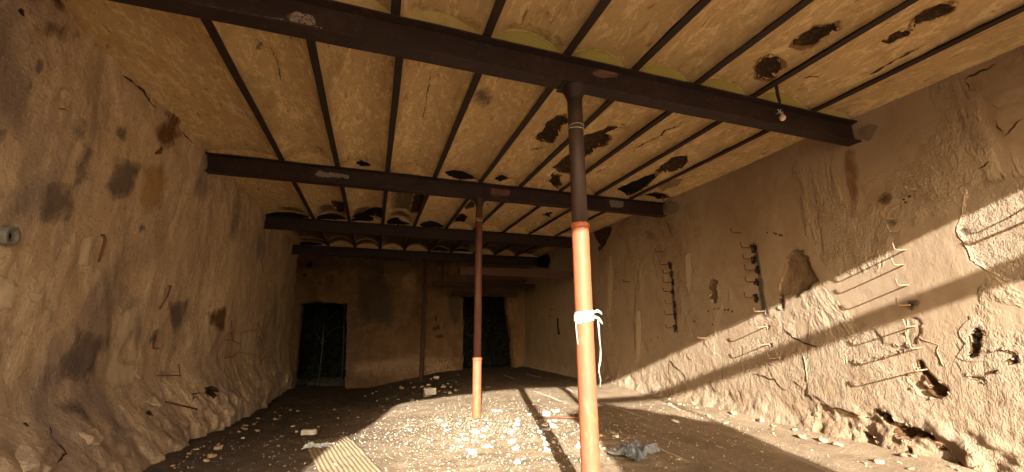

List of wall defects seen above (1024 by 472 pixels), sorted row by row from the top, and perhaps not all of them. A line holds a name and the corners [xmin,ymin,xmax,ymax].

spalling [789,21,840,50]
spalling [881,1,958,44]
crack [122,75,156,108]
spalling [535,114,568,145]
leakage [108,114,179,209]
spalling [617,155,687,199]
spalling [778,246,819,310]
leakage [210,308,226,331]
leakage [65,301,138,389]
spalling [957,315,1020,386]
spalling [906,359,949,400]
spalling [812,402,1001,472]